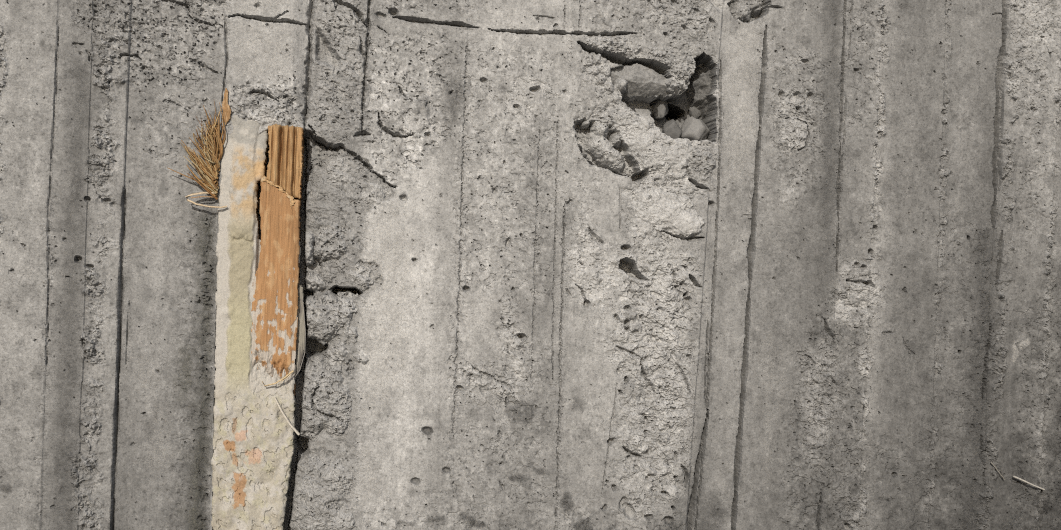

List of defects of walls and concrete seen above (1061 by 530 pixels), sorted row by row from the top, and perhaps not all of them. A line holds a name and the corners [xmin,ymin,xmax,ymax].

spalling [227,0,432,530]
crack [356,0,638,435]
crack [499,481,507,493]
crack [530,126,592,530]
spalling [566,0,724,527]
crack [681,5,784,530]
flaking render [730,0,765,23]
crack [979,435,988,487]
crack [981,324,994,400]
crack [990,0,1039,289]